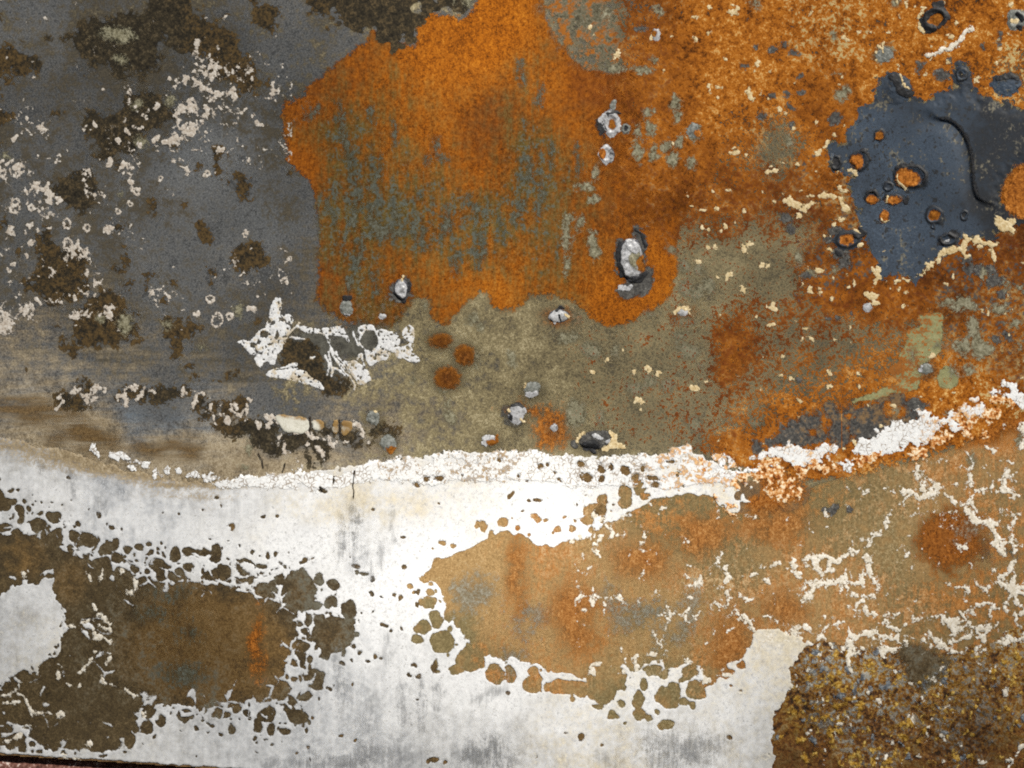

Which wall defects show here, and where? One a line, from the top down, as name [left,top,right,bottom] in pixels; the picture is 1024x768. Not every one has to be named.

peeling [255,63,293,102]
spalling [740,41,801,73]
spalling [745,72,806,130]
water stain [834,73,852,103]
peeling [0,39,269,336]
peeling [214,248,420,390]
rust [280,0,1024,557]
peeling [695,208,746,264]
peeling [762,20,1024,309]
water stain [935,278,1024,378]
peeling [0,313,1024,768]